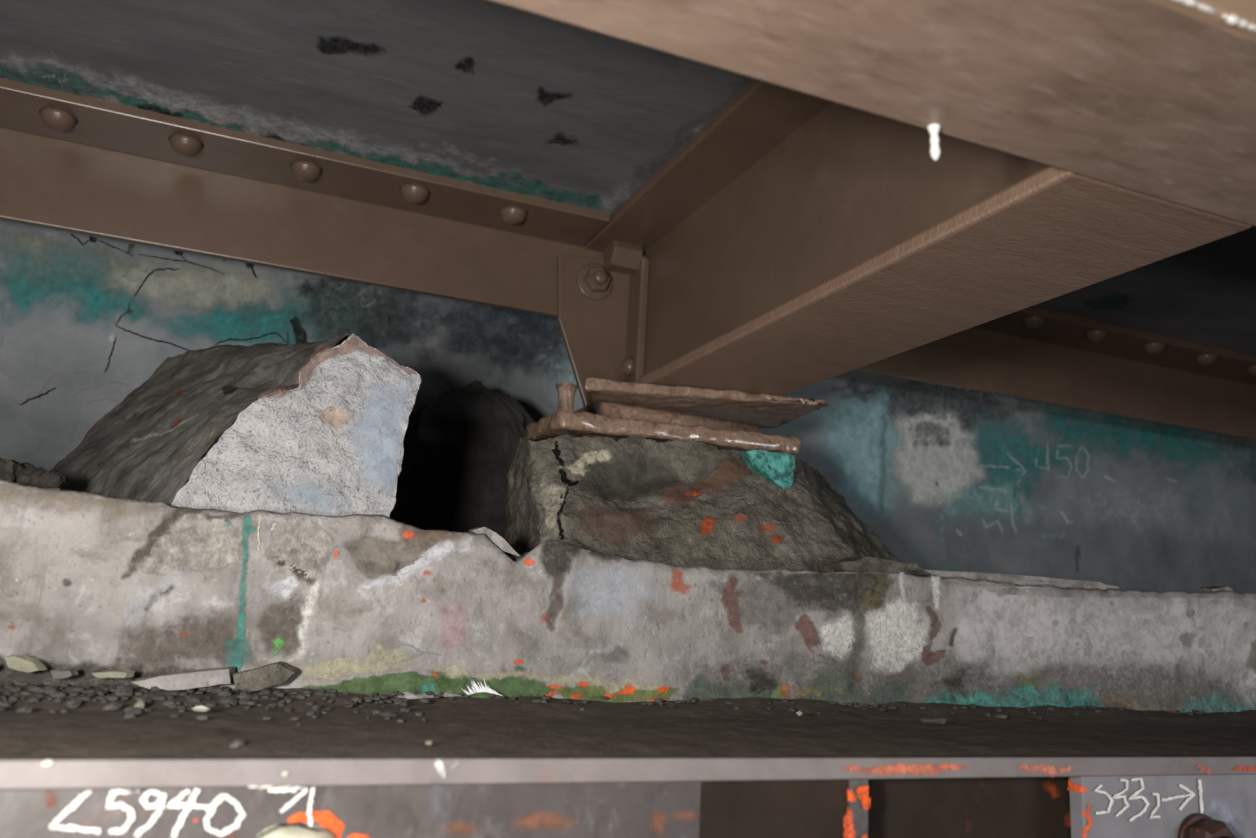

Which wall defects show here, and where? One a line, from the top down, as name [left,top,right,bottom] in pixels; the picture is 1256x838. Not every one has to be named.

crack [71,233,289,372]
crack [19,388,56,405]
crack [551,441,579,540]
water stain [824,392,904,511]
water stain [939,405,1218,557]